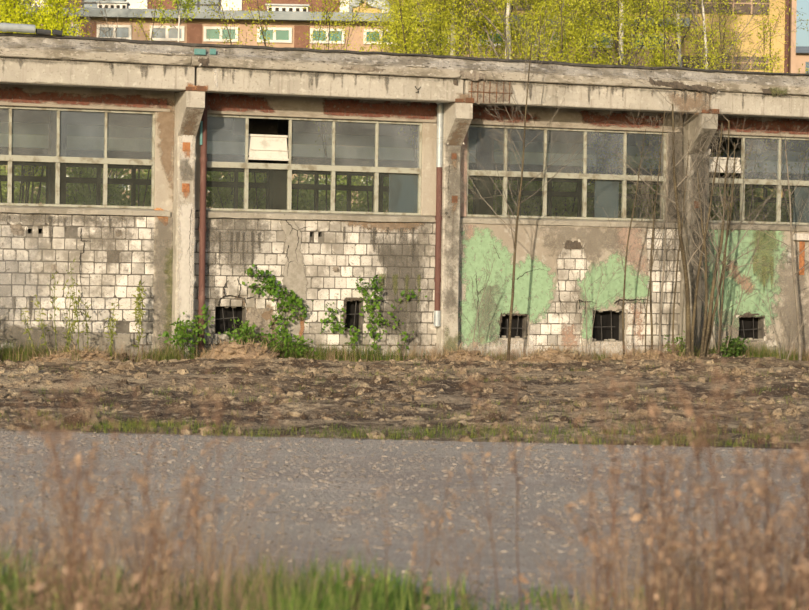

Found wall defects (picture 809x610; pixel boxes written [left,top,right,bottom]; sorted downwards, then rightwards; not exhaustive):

peeling [0,87,169,108]
peeling [208,93,275,113]
peeling [323,99,437,120]
spalling [453,69,540,123]
peeling [581,111,667,128]
peeling [716,118,809,135]
crack [281,219,309,274]
peeling [458,223,650,355]